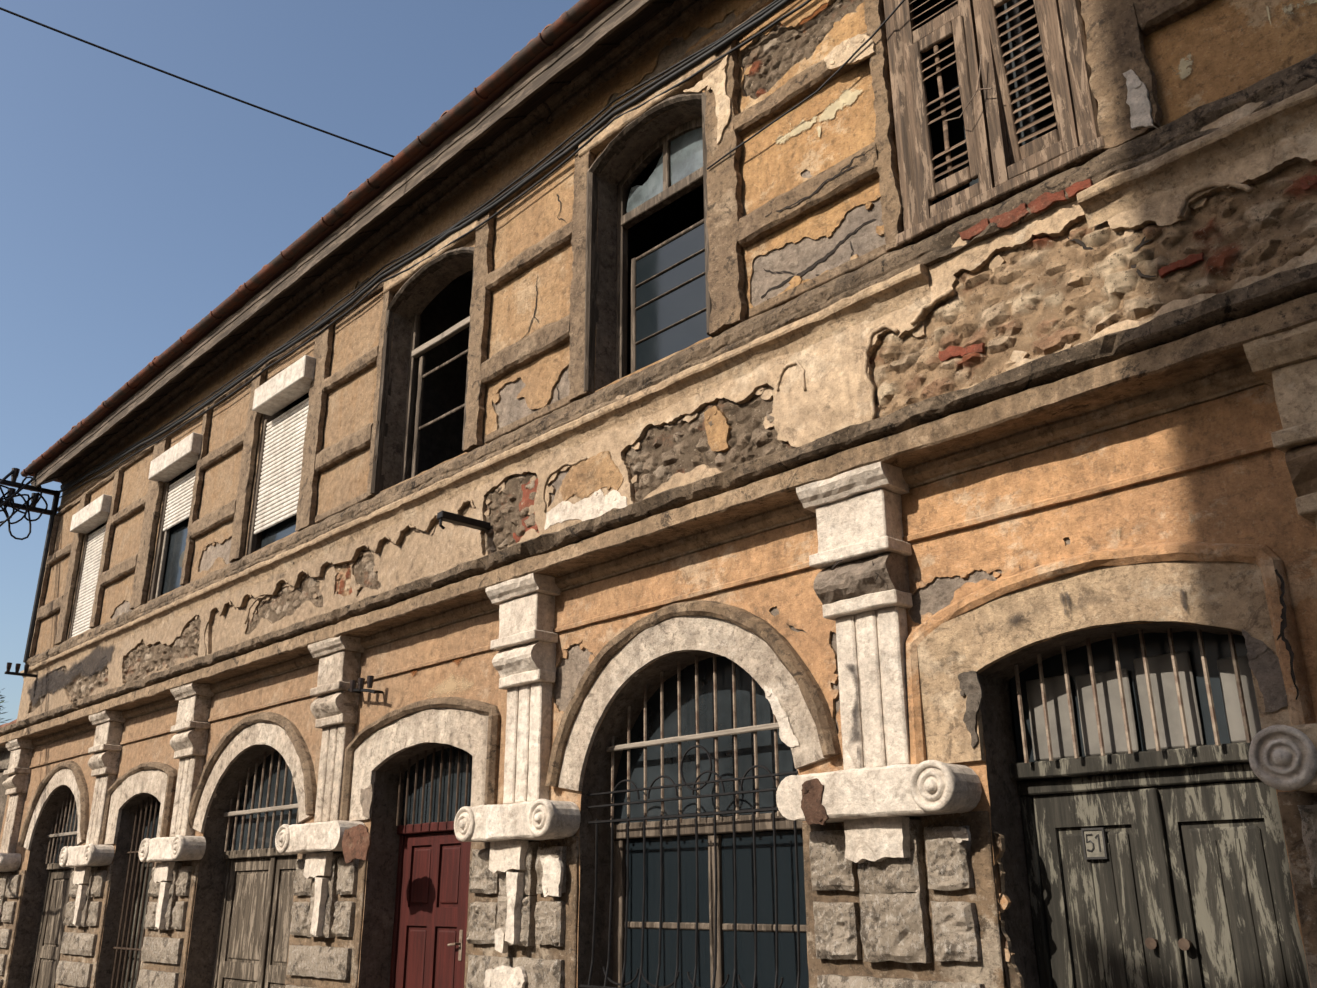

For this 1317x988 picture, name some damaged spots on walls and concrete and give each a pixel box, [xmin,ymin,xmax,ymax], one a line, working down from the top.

spalling [683,0,876,145]
peeling [1123,69,1158,130]
peeling [1176,54,1193,80]
crack [761,219,877,300]
spalling [869,161,1317,419]
spalling [492,367,570,428]
spalling [484,384,796,556]
spalling [246,550,381,635]
spalling [30,664,108,713]
spalling [124,615,201,683]